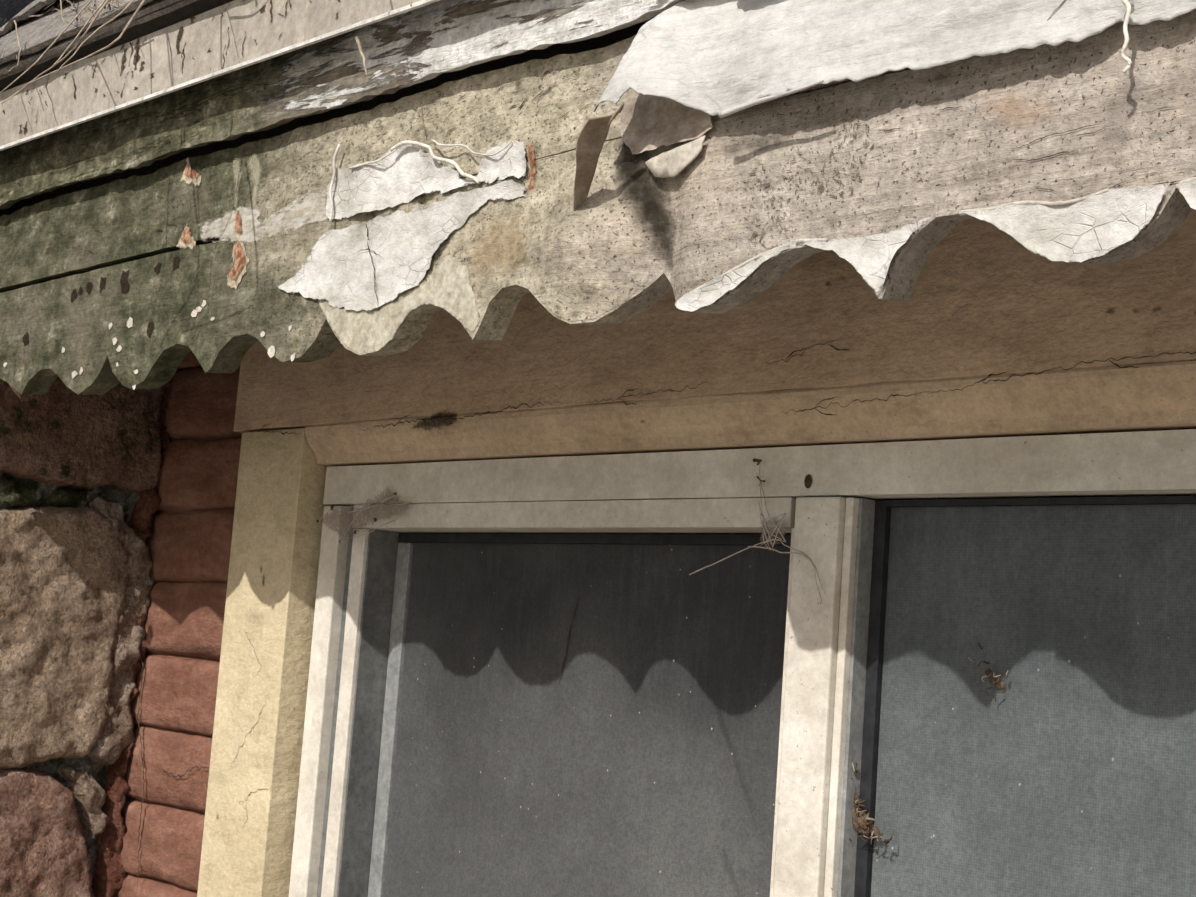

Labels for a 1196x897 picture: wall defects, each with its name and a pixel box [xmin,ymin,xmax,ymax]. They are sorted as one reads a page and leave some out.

peeling [573,0,1196,211]
corrosion [181,157,201,186]
leakage [233,156,259,205]
leakage [70,270,130,302]
leakage [154,256,180,274]
corrosion [176,226,196,249]
corrosion [227,210,249,289]
peeling [200,139,526,354]
peeling [959,177,1196,262]
crack [766,334,851,364]
crack [361,382,712,431]
crack [779,351,1196,415]